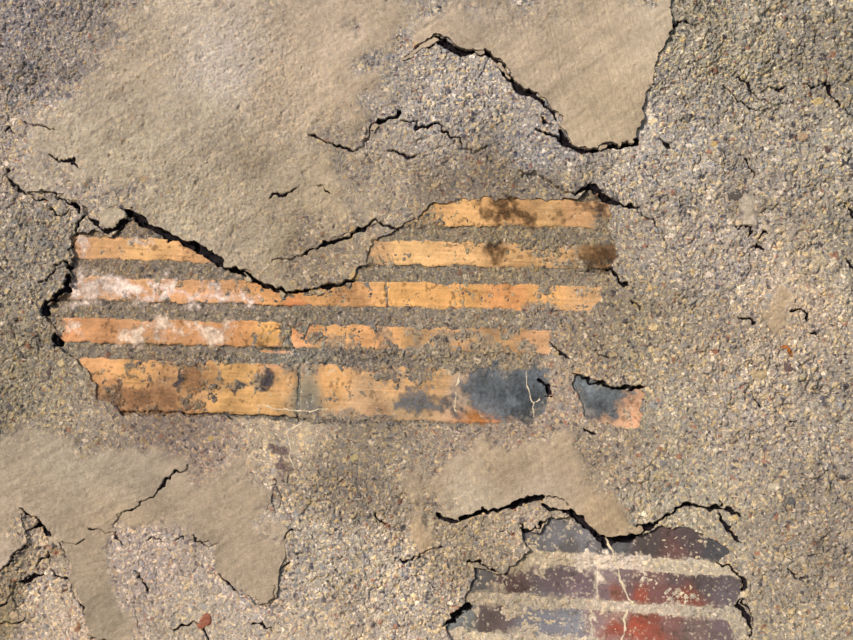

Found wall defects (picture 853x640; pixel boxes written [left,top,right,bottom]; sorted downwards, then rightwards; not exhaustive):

flaking render [395,25,644,155]
crack [403,120,462,144]
crack [50,155,79,169]
crack [571,183,658,228]
crack [7,169,135,347]
crack [298,219,399,257]
spalling [47,190,616,430]
crack [605,267,641,308]
spalling [572,374,645,429]
crack [125,470,182,512]
crack [6,508,95,585]
spalling [429,484,747,640]